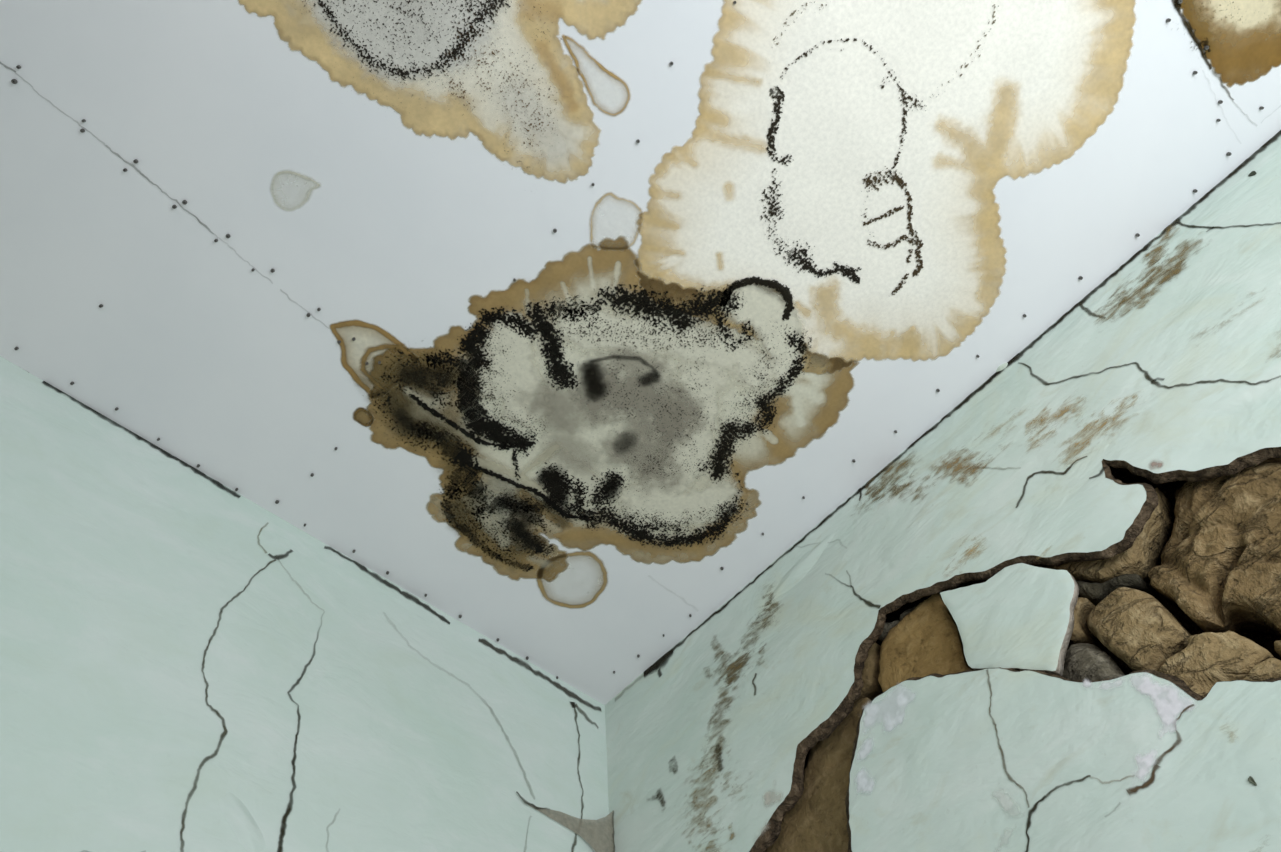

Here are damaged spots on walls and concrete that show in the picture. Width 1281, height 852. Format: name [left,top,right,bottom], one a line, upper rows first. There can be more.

leakage [1175,0,1281,87]
leakage [239,0,641,183]
crack [1176,219,1281,229]
leakage [330,0,1135,608]
corrosion [1100,226,1199,320]
crack [1020,362,1280,388]
corrosion [866,460,920,499]
corrosion [935,455,986,482]
corrosion [1065,405,1125,461]
crack [180,527,293,852]
flaking render [749,447,1281,852]
crack [277,642,316,852]